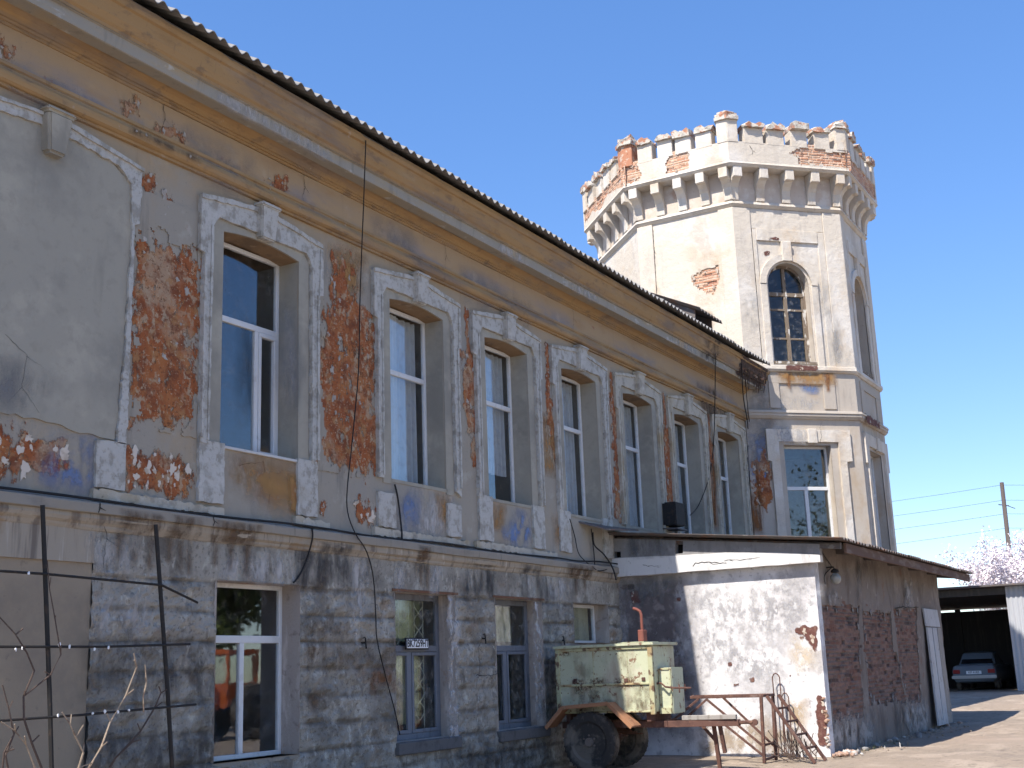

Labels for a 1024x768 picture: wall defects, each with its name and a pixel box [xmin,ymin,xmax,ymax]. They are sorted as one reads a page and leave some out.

spalling [789,144,876,199]
spalling [692,265,720,295]
peeling [127,229,202,430]
peeling [316,249,377,528]
peeling [459,307,476,467]
corrosion [781,372,834,390]
peeling [0,420,70,484]
peeling [125,445,195,500]
peeling [608,372,622,524]
corrosion [750,463,762,531]
water stain [214,523,284,580]
spalling [763,588,921,748]